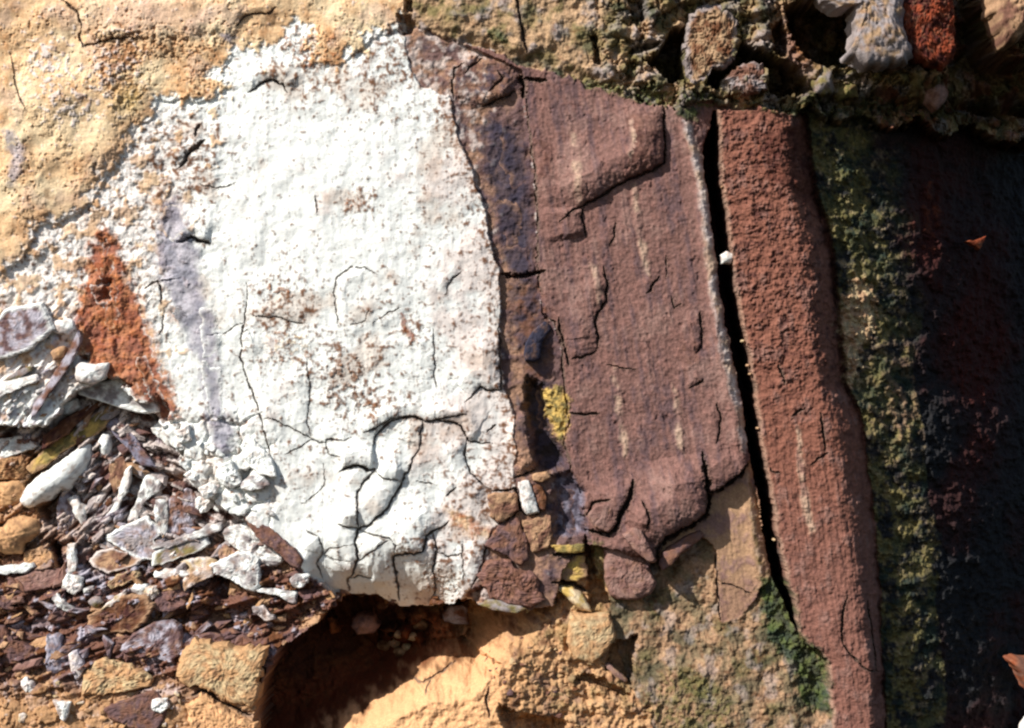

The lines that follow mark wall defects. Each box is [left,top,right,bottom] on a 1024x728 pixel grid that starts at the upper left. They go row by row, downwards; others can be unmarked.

corrosion [69,226,186,426]
crack [142,280,166,336]
crack [331,265,401,327]
crack [444,271,462,297]
crack [449,0,830,593]
crack [220,282,542,602]
peeling [0,330,303,668]
crack [713,553,752,621]
peeling [61,649,85,681]
peeling [104,690,166,728]